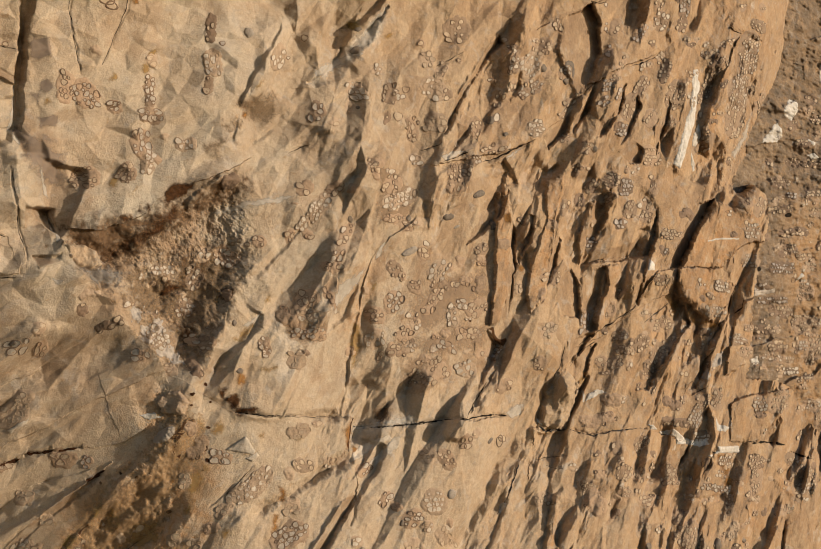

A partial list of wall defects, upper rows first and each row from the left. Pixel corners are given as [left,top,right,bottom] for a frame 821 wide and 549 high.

water stain [53,170,253,357]
crack [235,411,330,419]
crack [347,382,506,452]
crack [539,426,637,437]
crack [753,441,814,460]